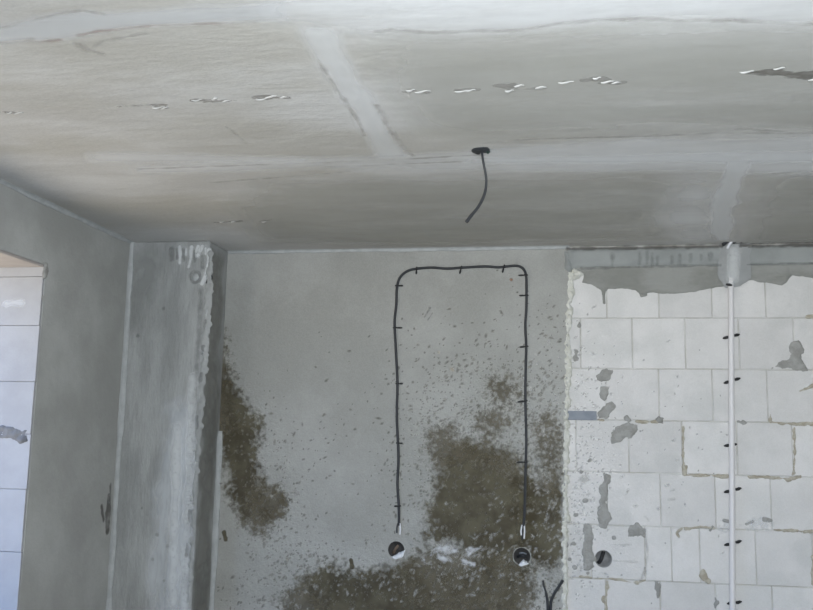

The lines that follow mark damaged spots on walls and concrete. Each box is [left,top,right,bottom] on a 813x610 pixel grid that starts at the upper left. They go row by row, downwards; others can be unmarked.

crack [46,30,111,51]
spalling [493,83,547,93]
damp [131,244,564,610]